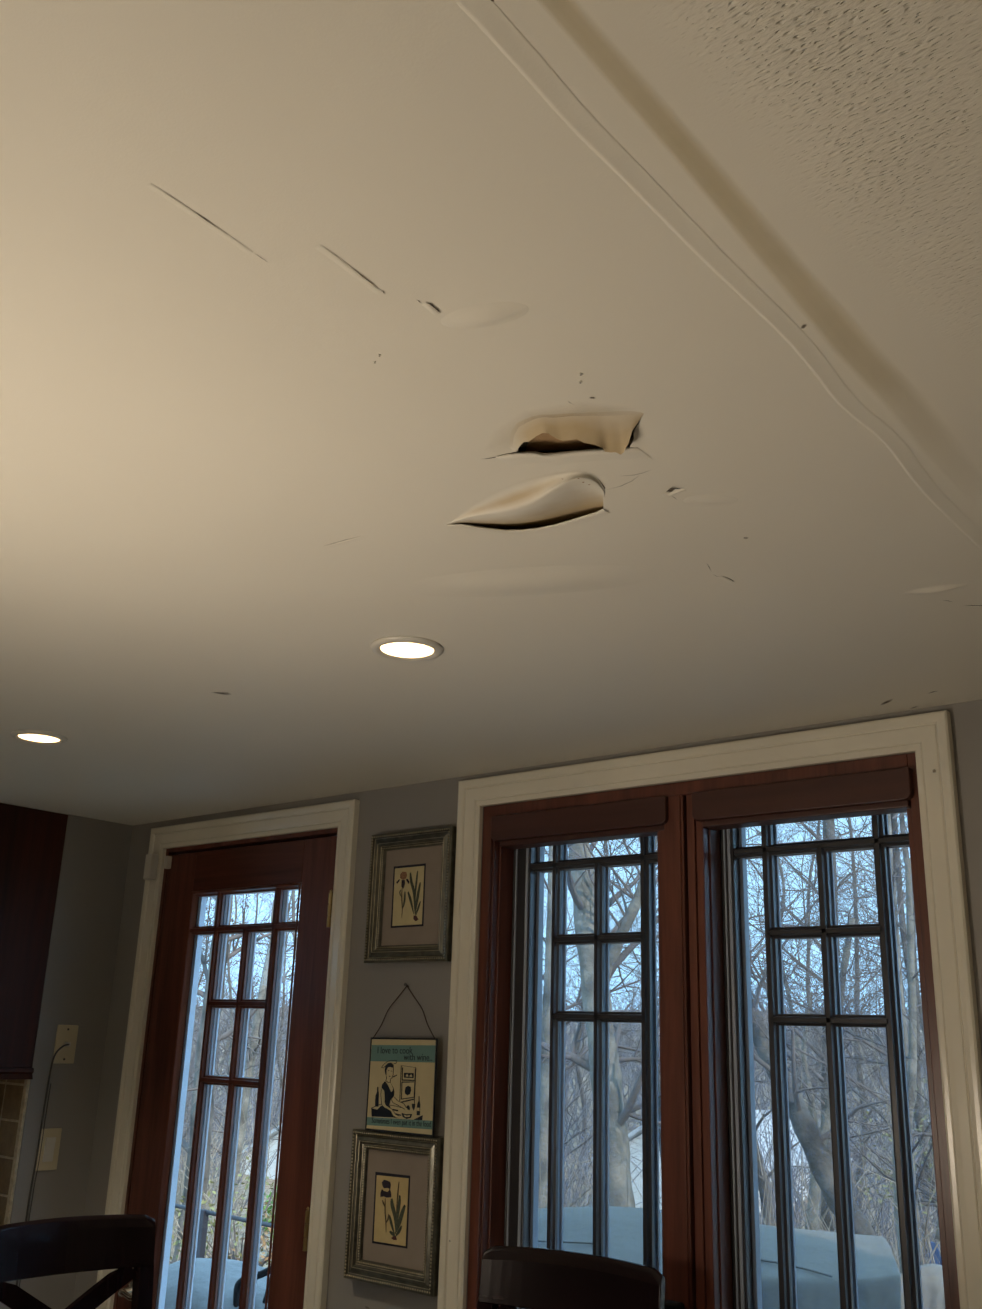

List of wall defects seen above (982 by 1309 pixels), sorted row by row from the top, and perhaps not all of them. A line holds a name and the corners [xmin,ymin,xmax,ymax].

crack [146,183,263,259]
crack [315,245,385,296]
crack [418,300,442,315]
spalling [516,442,597,453]